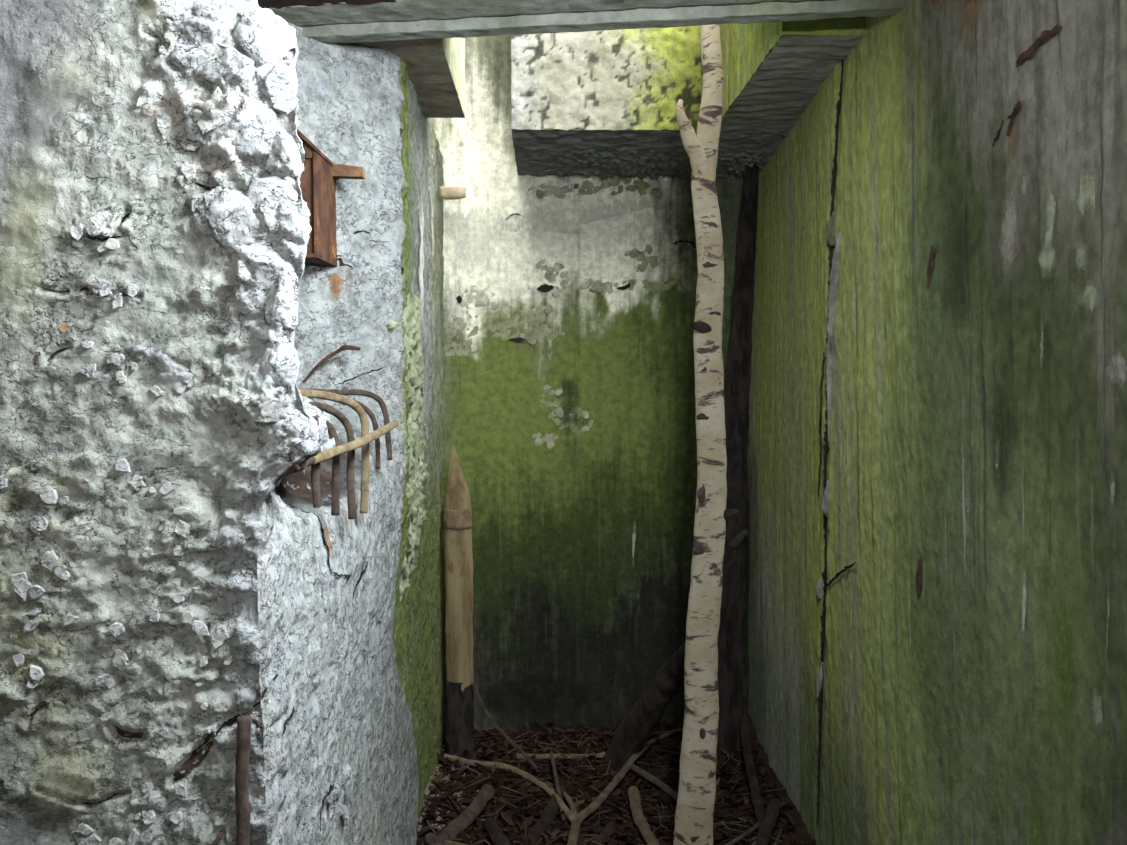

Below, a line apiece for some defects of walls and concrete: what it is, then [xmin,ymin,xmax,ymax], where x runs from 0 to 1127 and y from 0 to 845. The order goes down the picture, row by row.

damp [1002,173,1029,269]
damp [1039,193,1056,272]
damp [1077,174,1095,214]
spalling [136,0,430,601]
damp [1083,285,1097,310]
damp [1109,353,1127,383]
crack [817,60,856,827]
damp [1093,695,1102,724]